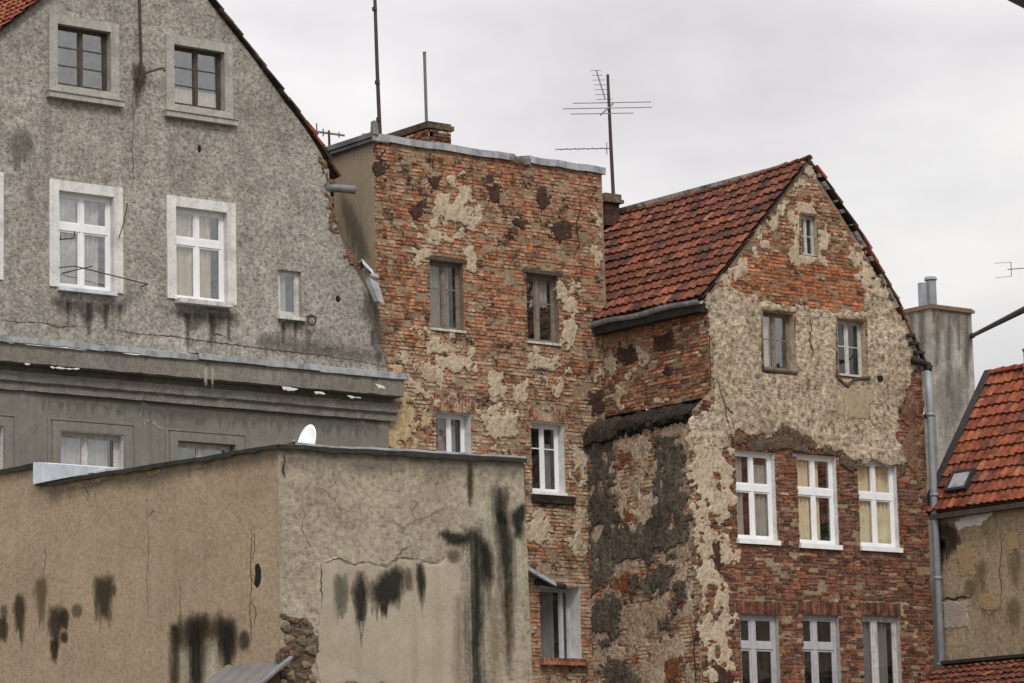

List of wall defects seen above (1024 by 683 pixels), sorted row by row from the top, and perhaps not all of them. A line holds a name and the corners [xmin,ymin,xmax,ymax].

peeling [752,162,816,265]
peeling [487,351,575,406]
spalling [588,330,676,416]
water stain [0,595,25,641]
water stain [36,580,81,662]
water stain [170,616,249,683]
crack [248,526,256,636]
spalling [275,613,320,683]
crack [301,476,449,604]
water stain [335,563,426,635]
water stain [440,464,525,683]
peeling [568,435,695,683]